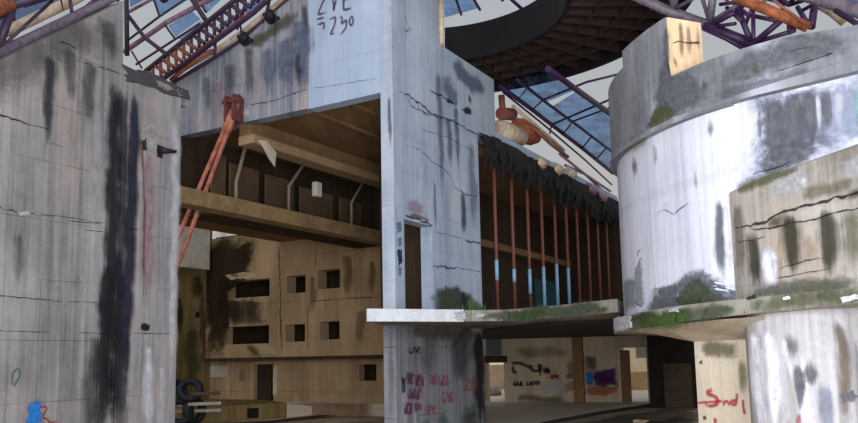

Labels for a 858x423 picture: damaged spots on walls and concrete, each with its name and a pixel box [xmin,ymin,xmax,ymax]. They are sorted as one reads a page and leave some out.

crack [0,114,62,147]
crack [400,90,481,196]
leakage [437,62,483,160]
leakage [758,89,858,174]
crack [0,205,102,232]
leakage [84,65,141,423]
leakage [169,127,198,376]
leakage [193,233,255,354]
leakage [650,271,736,310]
crack [735,191,858,243]
crack [778,258,829,279]
leakage [749,332,817,423]